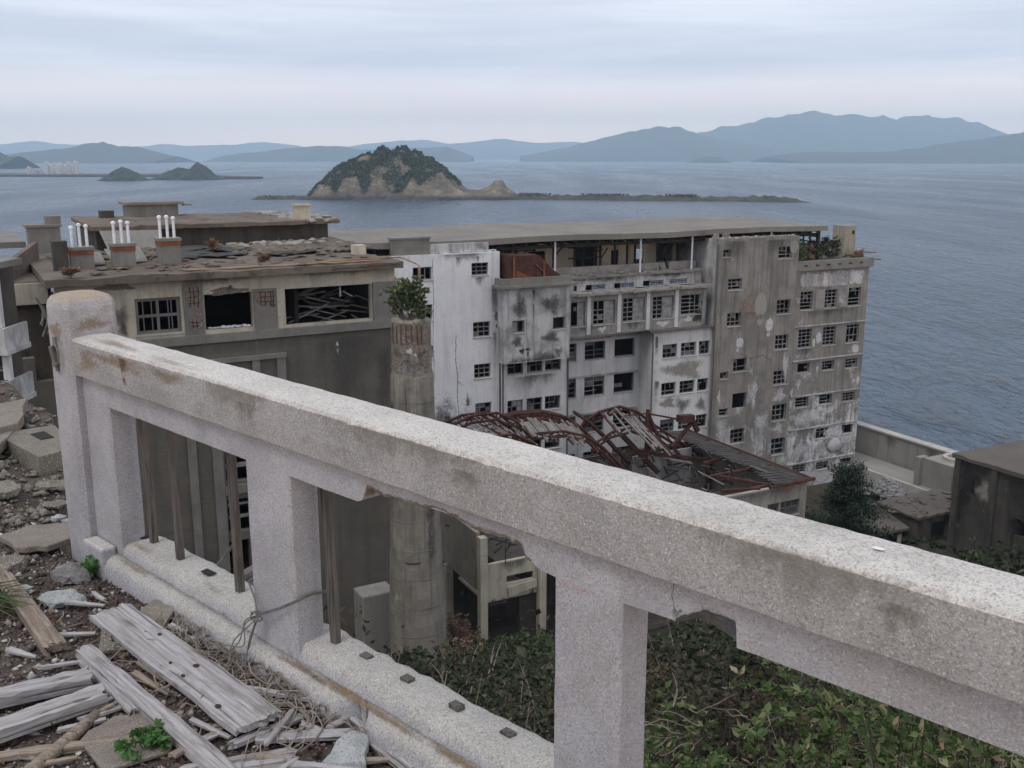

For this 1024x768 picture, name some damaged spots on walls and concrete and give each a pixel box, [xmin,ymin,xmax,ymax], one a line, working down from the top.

water stain [514,291,558,316]
spalling [755,293,773,337]
water stain [512,332,562,363]
water stain [655,361,699,389]
water stain [660,398,704,410]
peeling [800,425,854,484]
spalling [363,485,532,561]